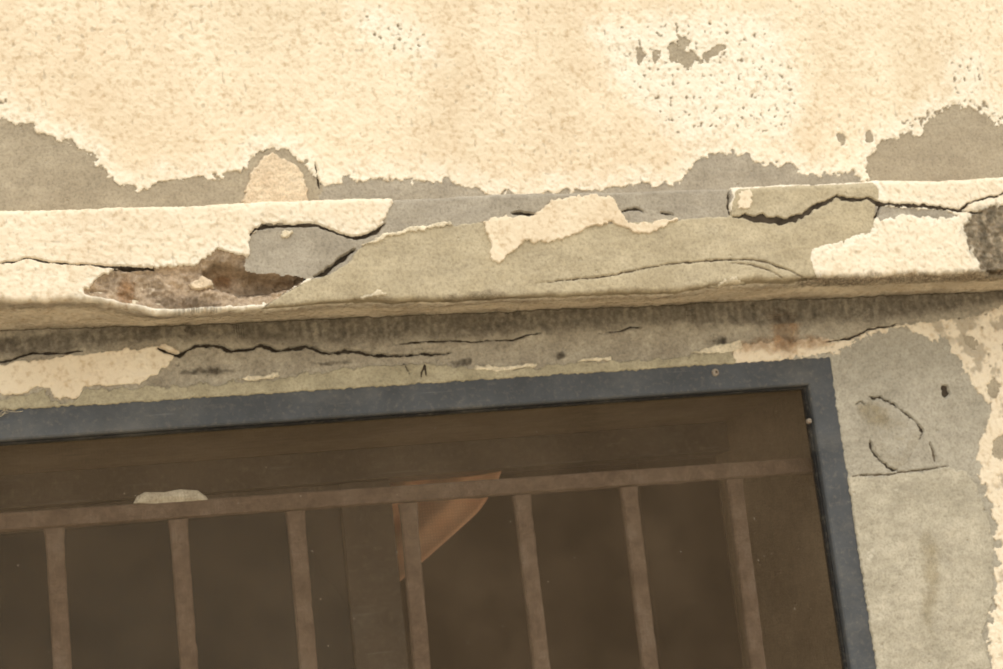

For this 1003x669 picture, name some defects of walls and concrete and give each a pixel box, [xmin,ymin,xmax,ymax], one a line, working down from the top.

flaking render [636,31,726,71]
flaking render [0,105,1003,311]
crack [726,192,1003,226]
crack [1,258,154,272]
crack [249,223,384,278]
crack [0,351,83,363]
crack [157,333,538,379]
flaking render [0,291,1003,669]
crack [852,444,948,477]